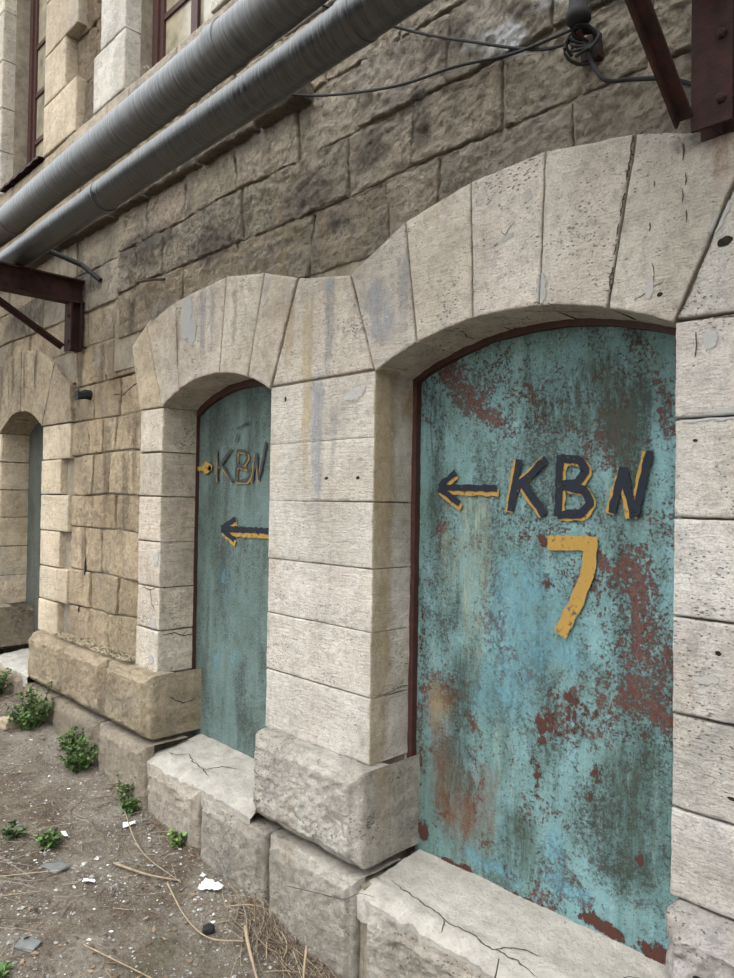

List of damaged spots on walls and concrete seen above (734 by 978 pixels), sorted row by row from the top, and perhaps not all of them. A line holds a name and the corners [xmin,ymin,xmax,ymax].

crack [168,752,236,776]
crack [396,884,538,977]